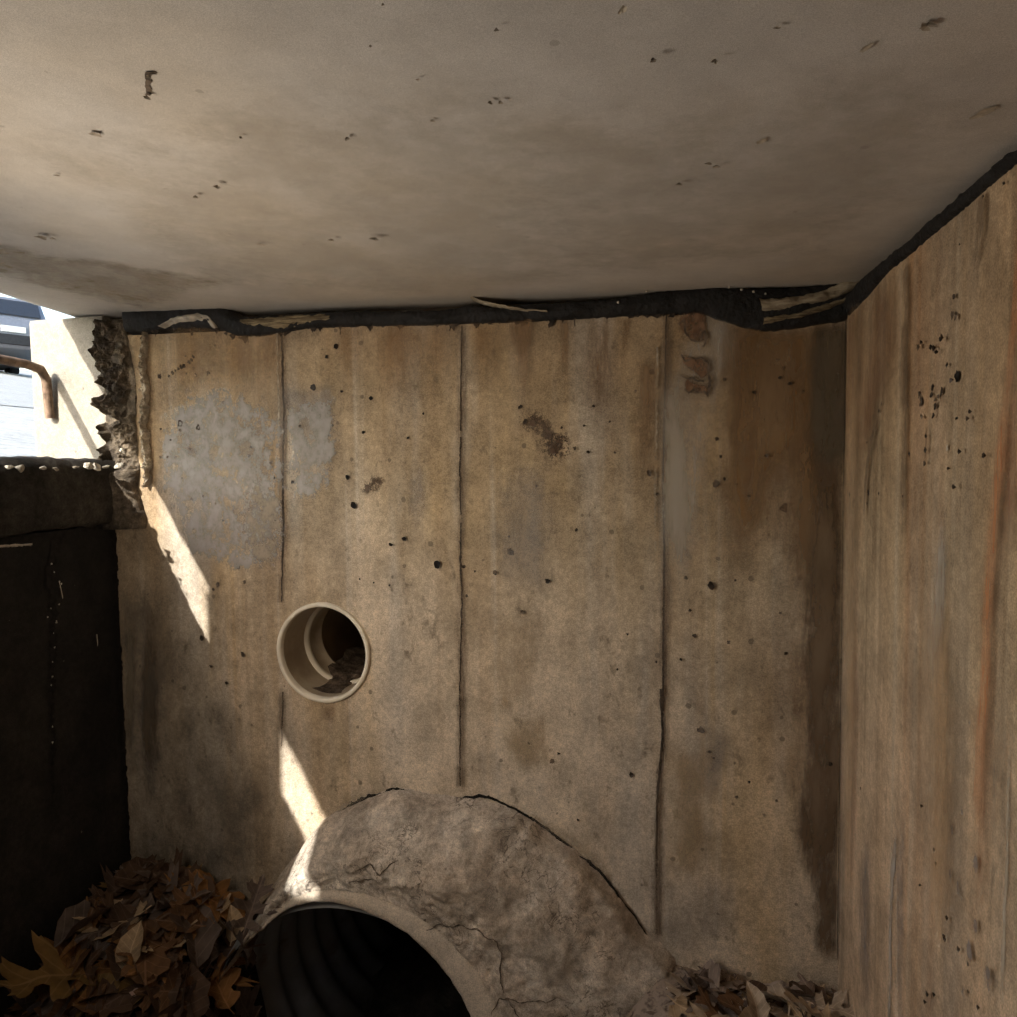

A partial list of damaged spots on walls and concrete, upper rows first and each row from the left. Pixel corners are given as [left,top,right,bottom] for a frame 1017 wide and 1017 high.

crack [457,315,670,935]
damp [726,327,847,955]
crack [343,787,408,810]
crack [349,860,398,883]
crack [426,924,556,1017]